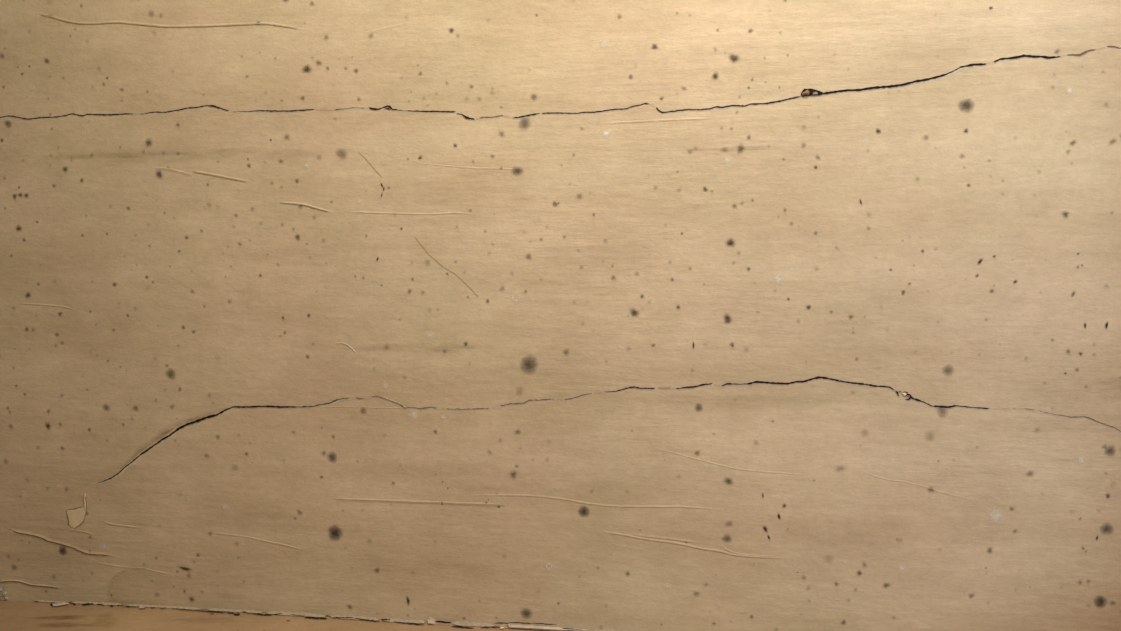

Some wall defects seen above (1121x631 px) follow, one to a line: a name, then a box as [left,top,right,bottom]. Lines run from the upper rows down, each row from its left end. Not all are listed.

crack [0,46,1121,121]
crack [97,376,1121,485]